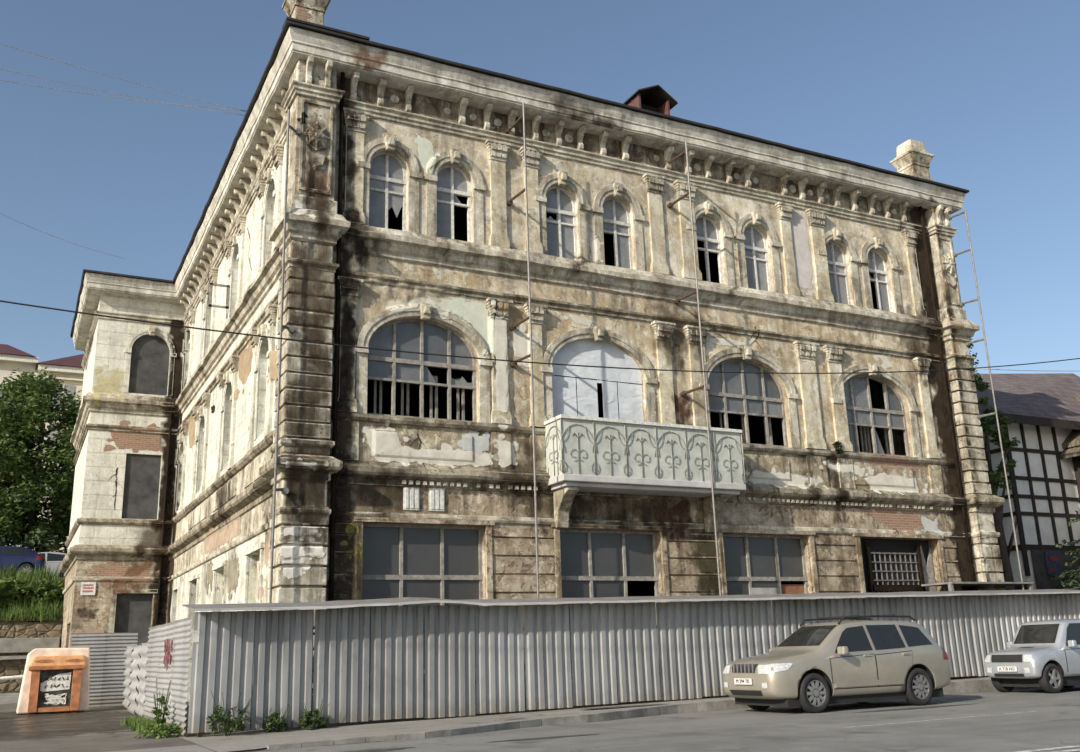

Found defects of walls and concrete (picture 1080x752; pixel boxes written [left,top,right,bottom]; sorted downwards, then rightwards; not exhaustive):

flaking render [231,336,253,399]
leakage [286,99,407,609]
peeling [361,286,538,470]
crack [109,468,123,510]
flaking render [103,420,166,453]
leakage [137,318,187,634]
flaking render [745,455,944,537]
flaking render [201,513,241,599]
peeling [258,522,326,611]
leakage [690,525,724,596]